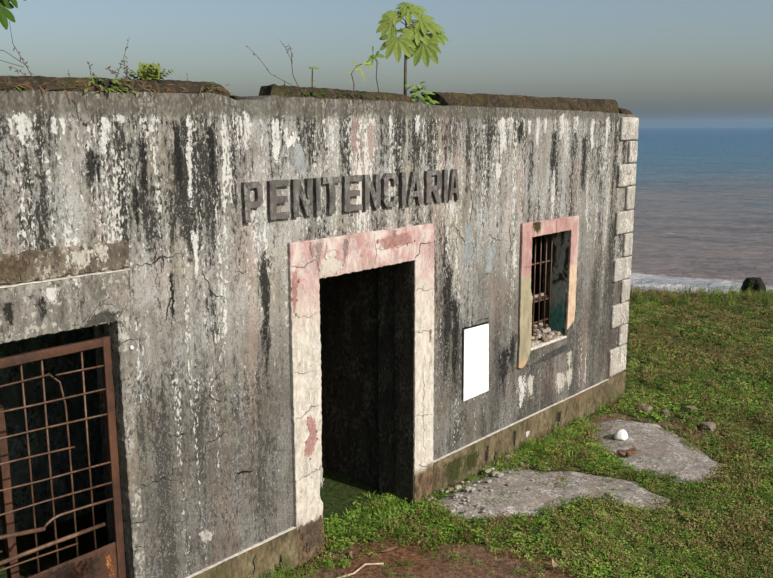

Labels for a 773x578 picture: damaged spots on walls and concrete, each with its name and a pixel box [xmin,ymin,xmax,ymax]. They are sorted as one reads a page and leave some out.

damp [7,111,35,150]
damp [86,113,124,194]
damp [171,115,195,208]
damp [495,114,595,201]
crack [137,250,178,321]
damp [190,230,199,280]
peeling [320,255,344,278]
peeling [377,232,415,249]
damp [258,246,272,398]
damp [441,257,461,401]
spalling [535,344,570,364]
peeling [304,416,318,460]